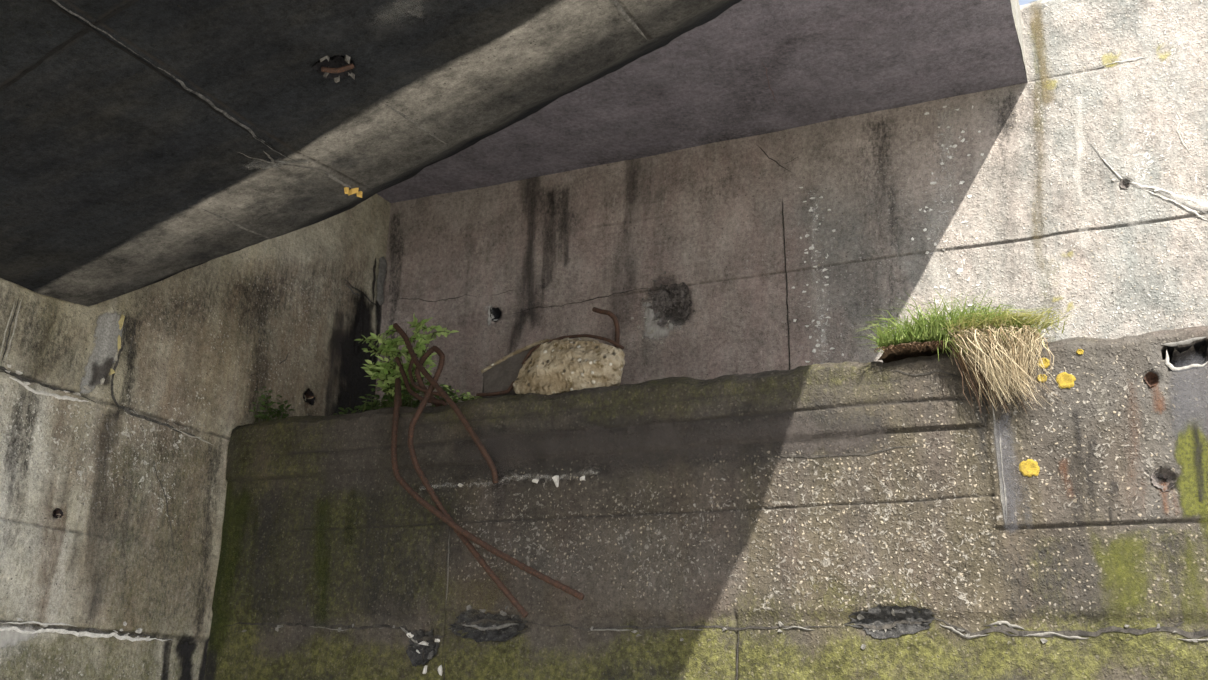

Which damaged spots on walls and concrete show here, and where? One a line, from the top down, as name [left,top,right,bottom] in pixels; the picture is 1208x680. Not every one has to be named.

crack [44,0,362,198]
spalling [312,55,355,83]
crack [1087,141,1208,221]
damp [510,177,568,353]
spalling [631,271,695,344]
crack [0,295,212,445]
damp [325,292,382,416]
damp [1194,424,1203,501]
crack [0,618,173,642]
spalling [406,605,528,676]
spalling [844,605,935,650]
crack [927,611,1208,644]